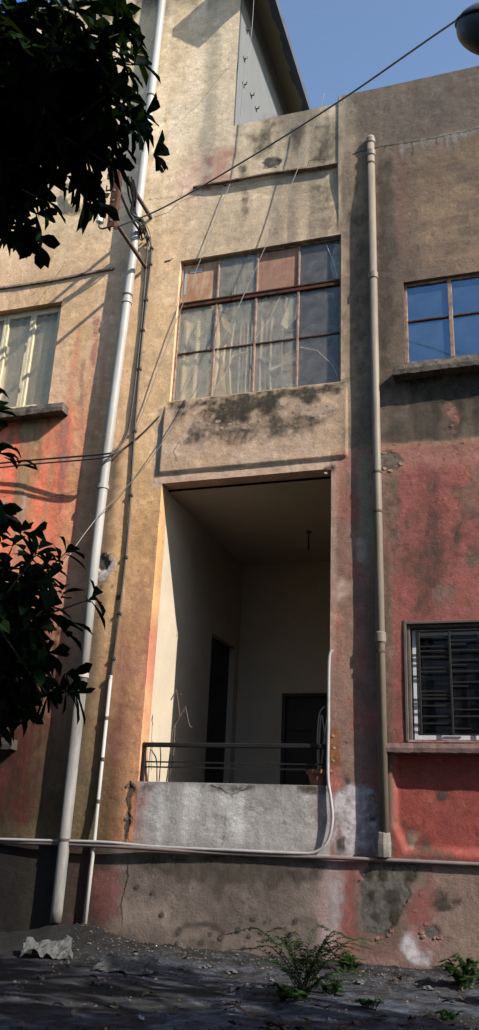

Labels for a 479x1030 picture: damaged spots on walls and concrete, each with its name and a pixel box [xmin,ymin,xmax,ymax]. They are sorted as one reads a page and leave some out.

damp [171,382,343,442]
spalling [98,552,116,580]
crack [124,781,133,830]
spalling [331,785,442,966]